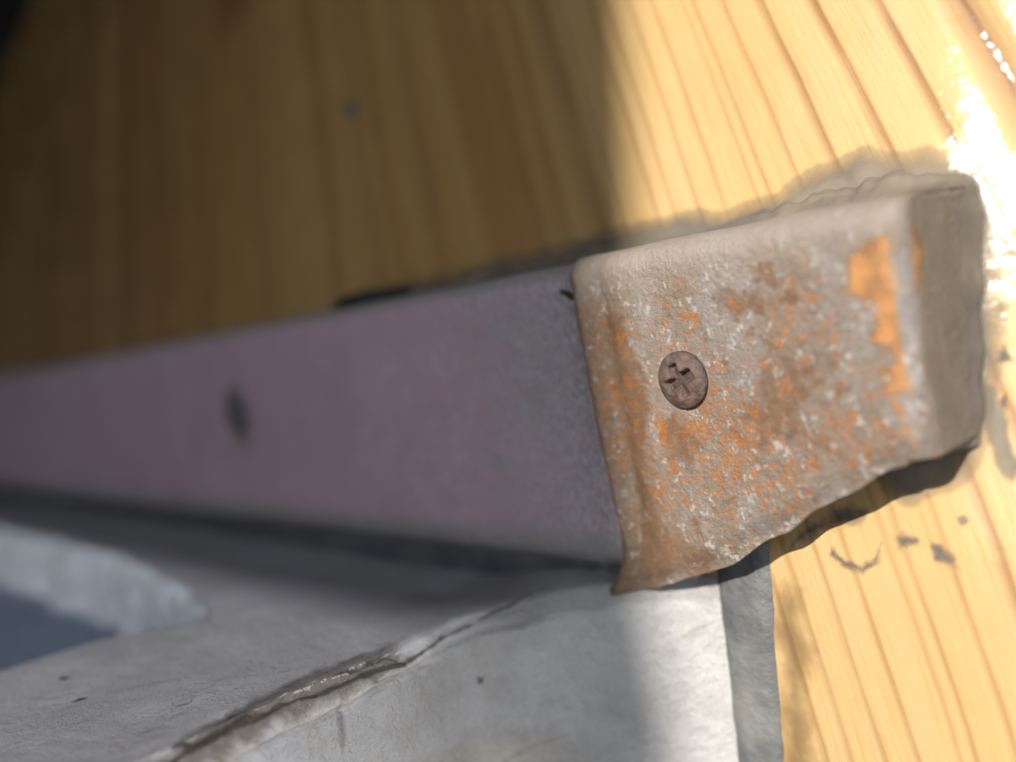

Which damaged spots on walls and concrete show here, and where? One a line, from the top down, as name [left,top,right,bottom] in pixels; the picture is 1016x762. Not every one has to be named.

rust [608,316,707,477]
rust [848,234,913,415]
spalling [0,527,209,671]
rust [638,471,713,578]